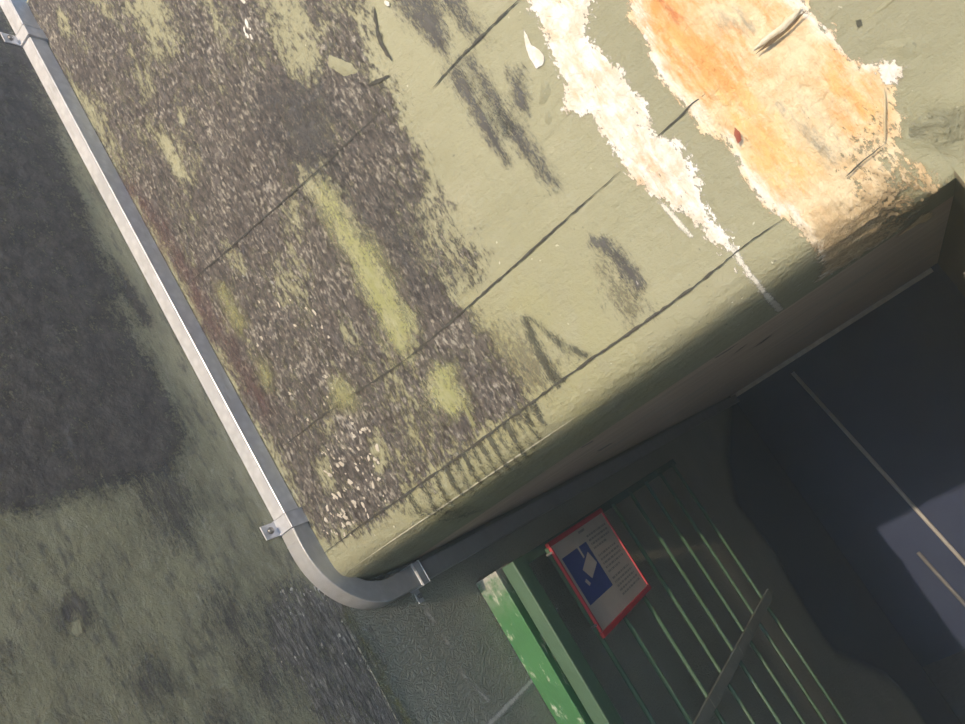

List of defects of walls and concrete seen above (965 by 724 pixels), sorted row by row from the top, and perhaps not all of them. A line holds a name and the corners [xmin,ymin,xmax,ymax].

leakage [0,0,588,556]
leakage [394,0,784,325]
corrosion [625,0,947,283]